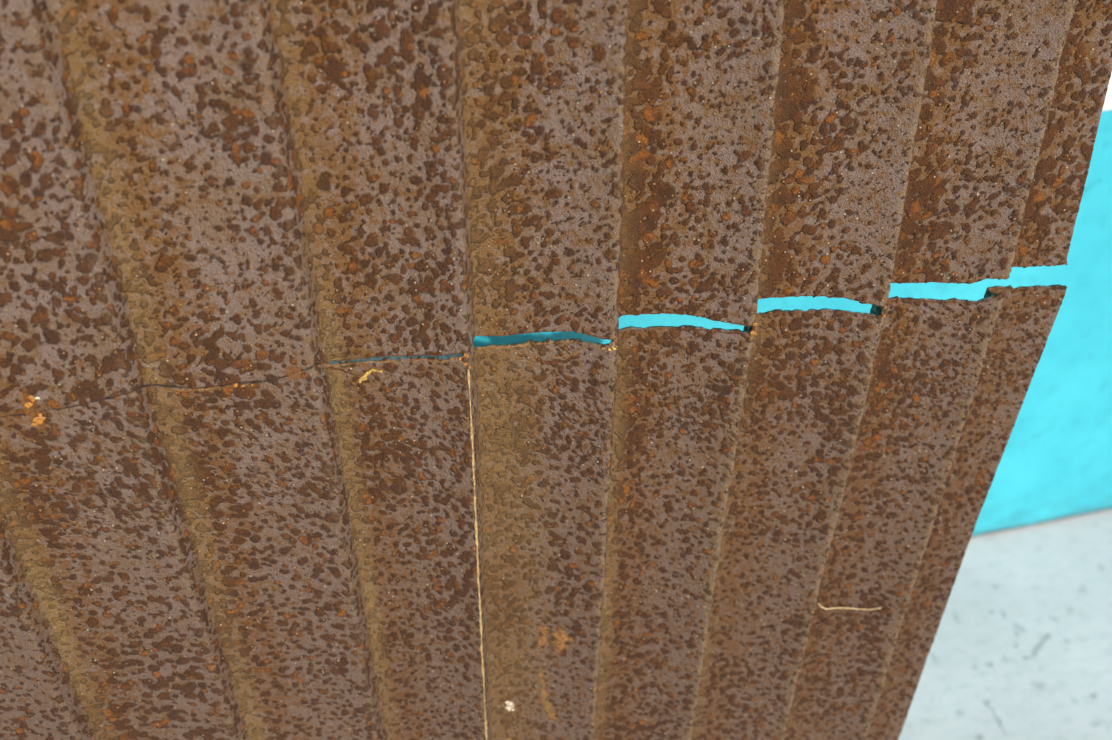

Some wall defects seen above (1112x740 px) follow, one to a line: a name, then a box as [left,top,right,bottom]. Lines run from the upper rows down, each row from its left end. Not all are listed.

corrosion [24,396,46,426]
crack [1,264,1061,740]